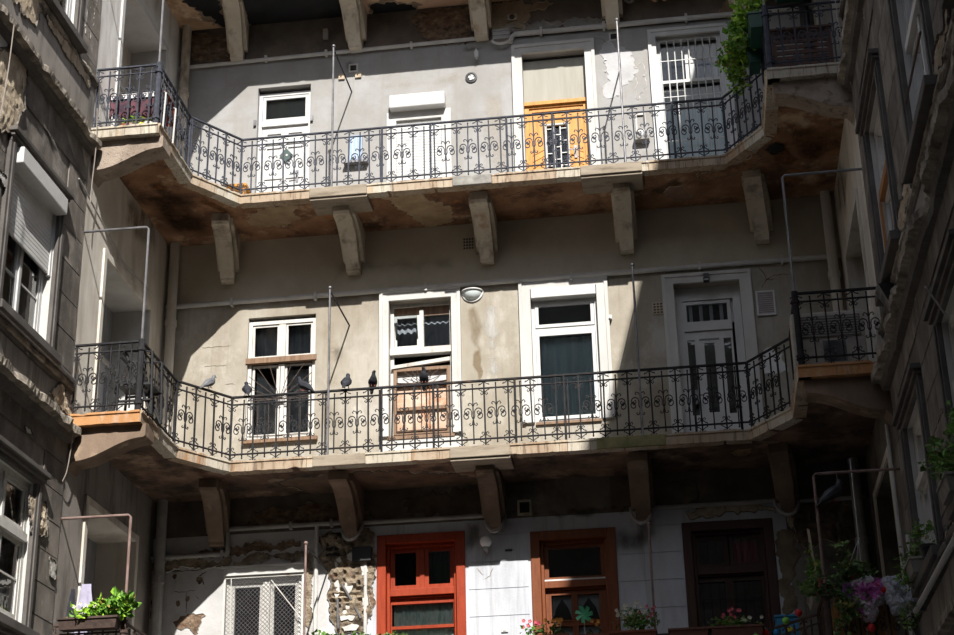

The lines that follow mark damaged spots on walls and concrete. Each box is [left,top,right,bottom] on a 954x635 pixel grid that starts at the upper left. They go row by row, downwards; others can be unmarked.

spalling [0,35,29,134]
spalling [181,0,231,64]
spalling [490,0,602,32]
peeling [598,41,639,99]
spalling [931,9,951,79]
spalling [894,183,912,236]
peeling [348,469,482,517]
spalling [149,474,377,635]